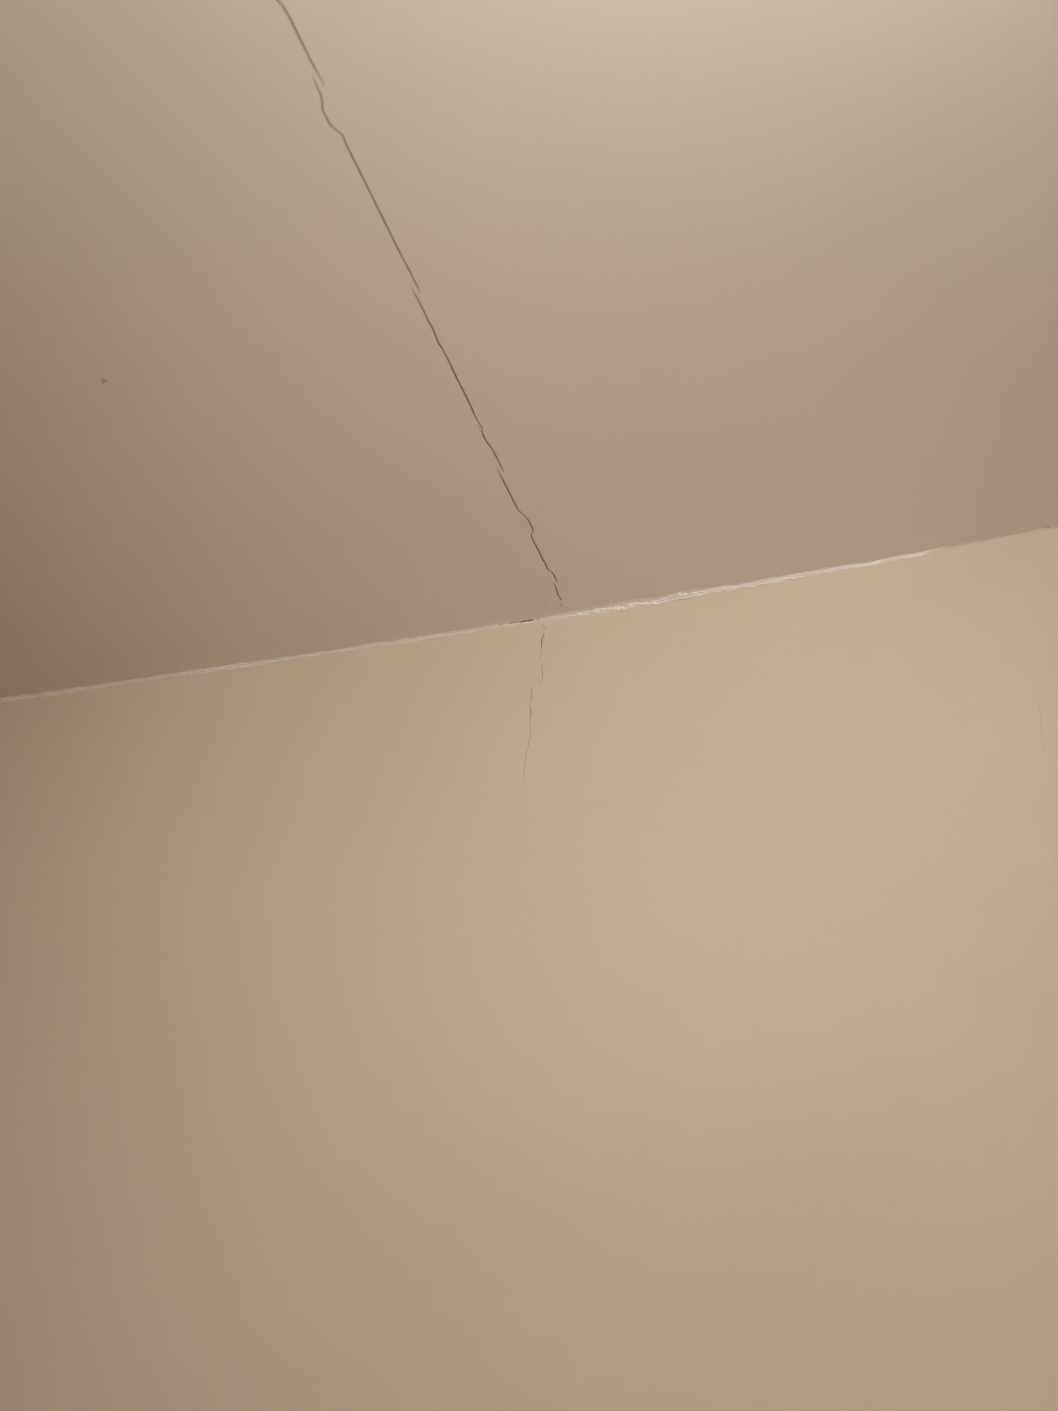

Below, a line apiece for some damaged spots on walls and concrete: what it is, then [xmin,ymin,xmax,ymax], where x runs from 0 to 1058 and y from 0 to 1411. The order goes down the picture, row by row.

crack [277,0,562,772]